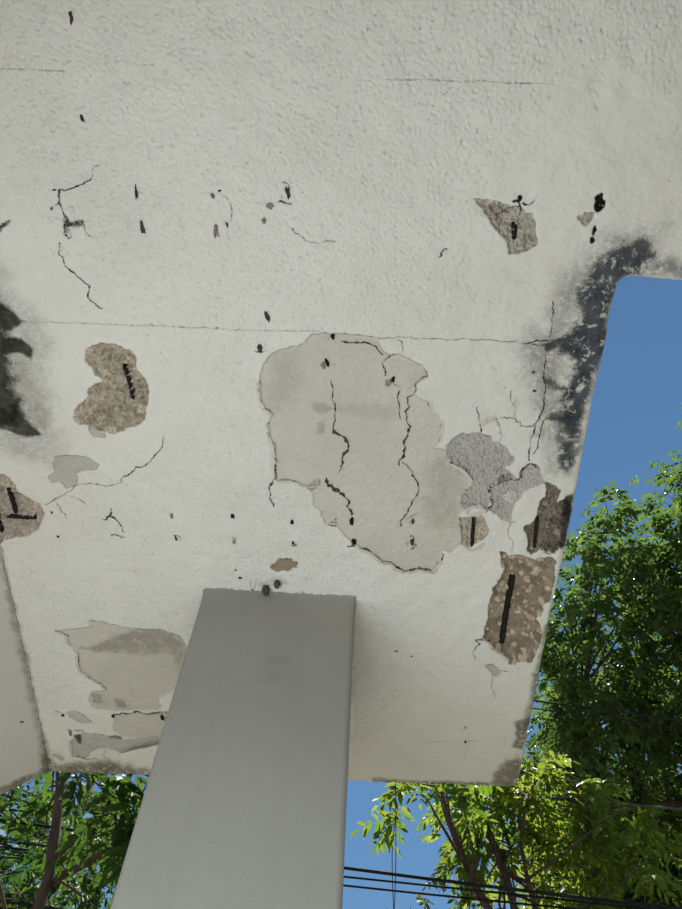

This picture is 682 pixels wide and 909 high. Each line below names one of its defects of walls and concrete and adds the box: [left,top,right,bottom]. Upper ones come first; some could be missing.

crack [50,165,99,216]
crack [58,243,103,309]
spalling [473,195,538,255]
mould [0,303,40,437]
spalling [0,473,45,543]
peeling [48,455,99,489]
spalling [73,343,149,438]
crack [308,380,357,547]
peeling [256,333,573,697]
crack [341,301,559,527]
damp [544,239,654,470]
peeling [49,621,188,762]